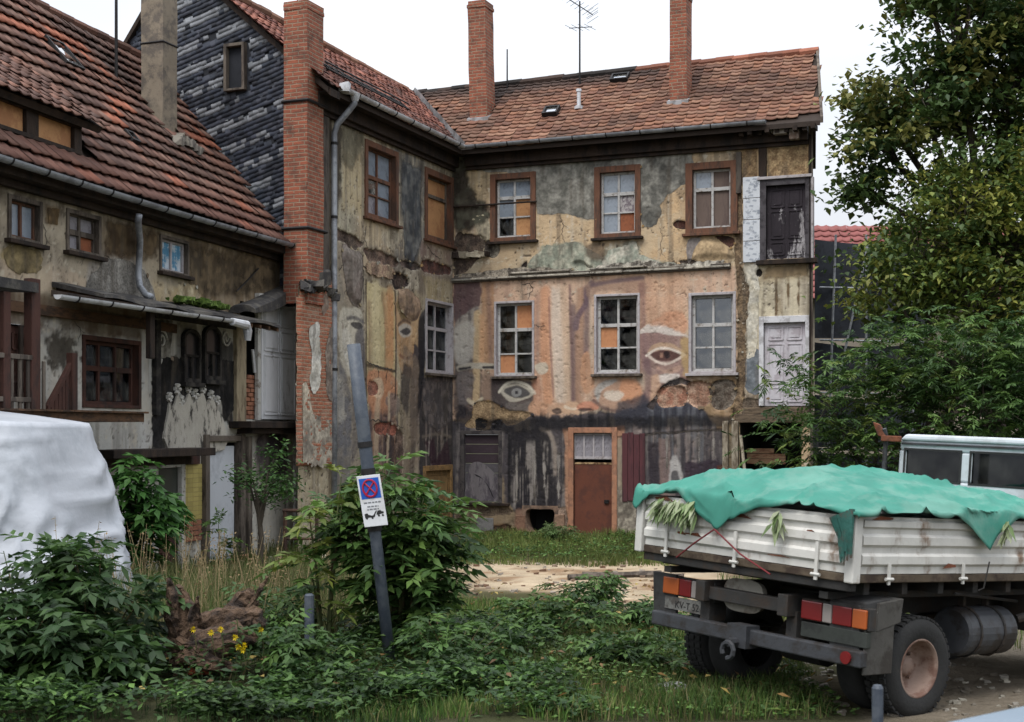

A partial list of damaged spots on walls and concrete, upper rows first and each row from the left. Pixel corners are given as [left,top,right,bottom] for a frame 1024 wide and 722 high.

flaking render [295,283,333,468]
damp [533,454,560,503]
spalling [337,146,808,420]
damp [481,416,734,468]